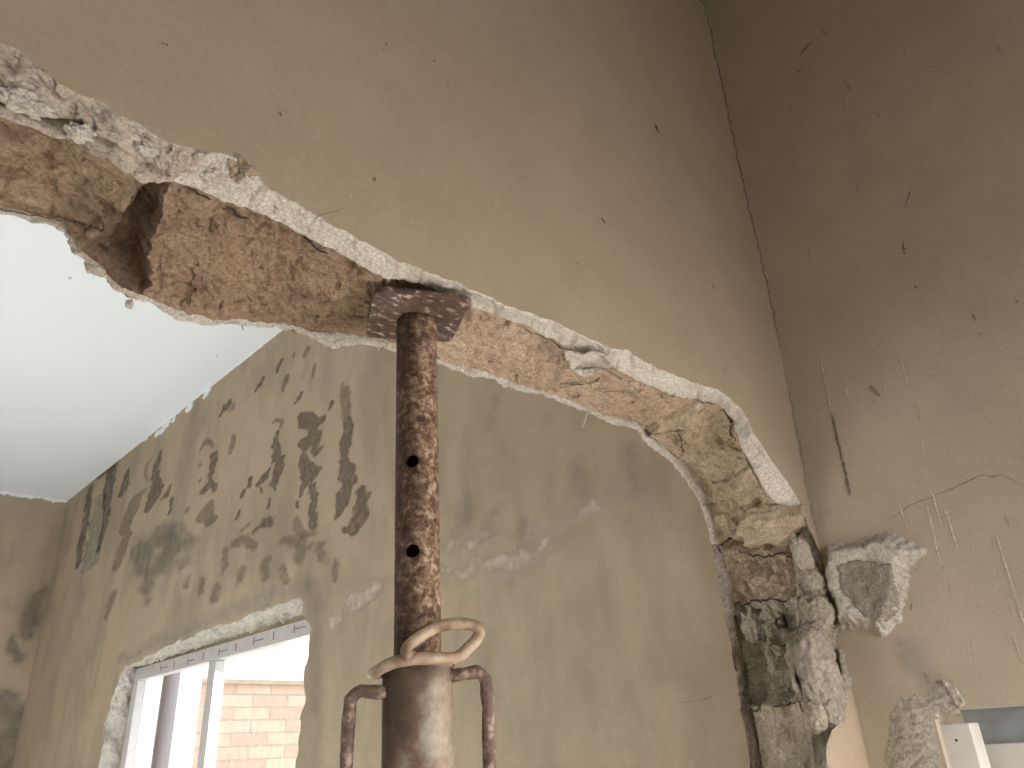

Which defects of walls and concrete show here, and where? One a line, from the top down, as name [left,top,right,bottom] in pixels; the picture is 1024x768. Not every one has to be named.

crack [704,5,781,351]
spalling [0,43,835,768]
crack [717,537,789,573]
crack [789,392,818,533]
crack [889,475,1014,519]
spalling [829,622,853,712]